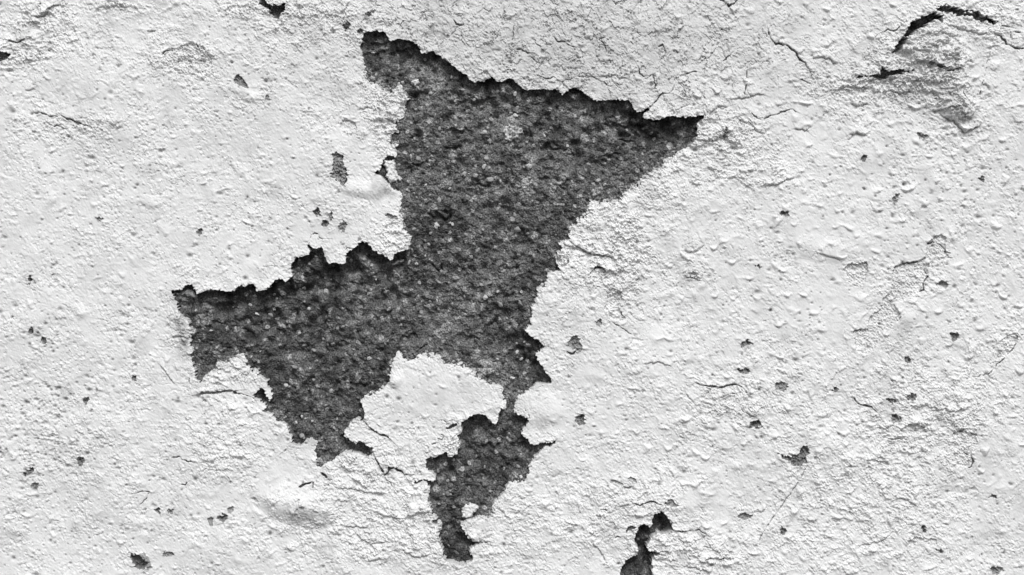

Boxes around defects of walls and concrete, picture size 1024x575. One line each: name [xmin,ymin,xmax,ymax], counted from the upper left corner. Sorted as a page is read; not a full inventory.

peeling [161,43,213,70]
crack [856,5,1024,102]
peeling [172,21,704,562]
peeling [620,511,672,575]